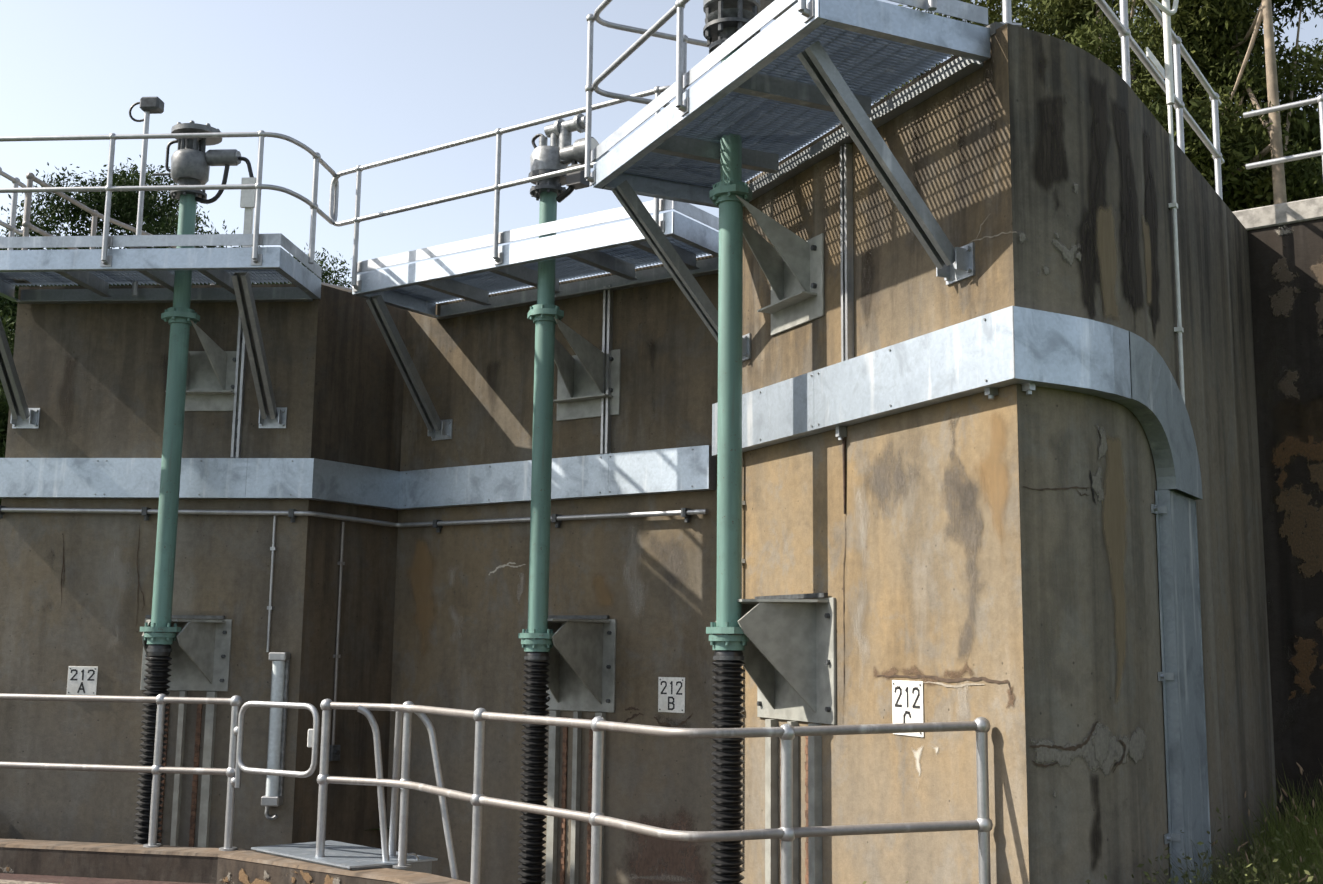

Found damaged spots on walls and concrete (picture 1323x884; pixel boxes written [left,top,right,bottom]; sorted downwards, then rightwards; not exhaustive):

damp [1036,98,1068,207]
damp [1080,77,1159,335]
crack [489,562,525,592]
damp [944,441,983,655]
crack [1023,486,1091,496]
peeling [1271,435,1323,578]
crack [874,663,1012,700]
peeling [1288,617,1323,700]
peeling [221,868,272,884]
peeling [291,869,340,884]